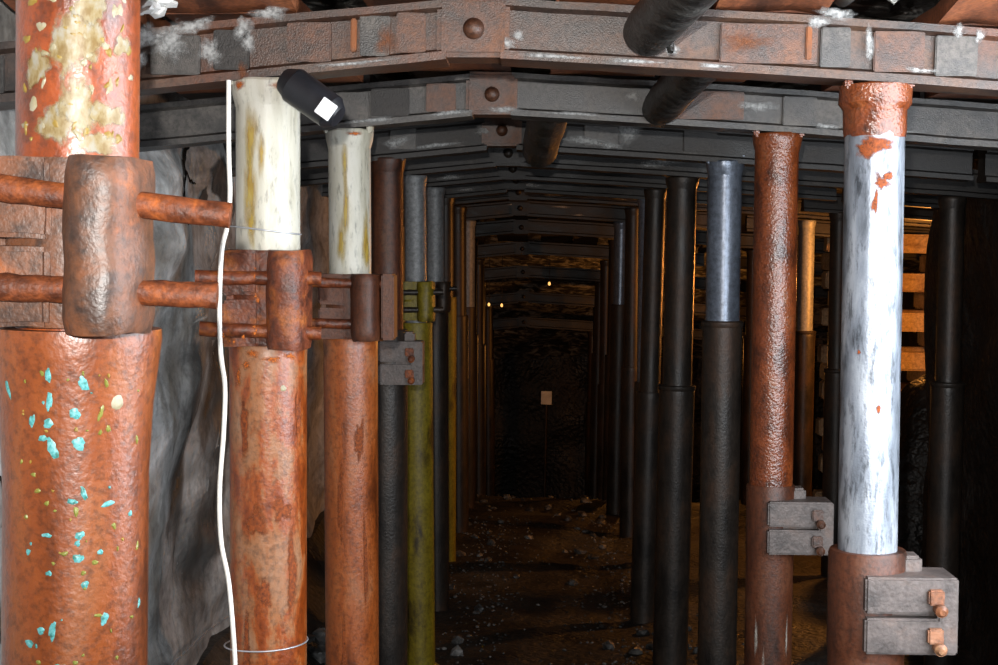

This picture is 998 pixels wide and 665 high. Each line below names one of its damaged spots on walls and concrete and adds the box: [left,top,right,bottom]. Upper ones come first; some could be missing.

peeling [21,0,133,156]
rust [236,350,295,385]
rust [240,400,248,456]
rust [355,419,364,462]
rust [246,497,297,614]